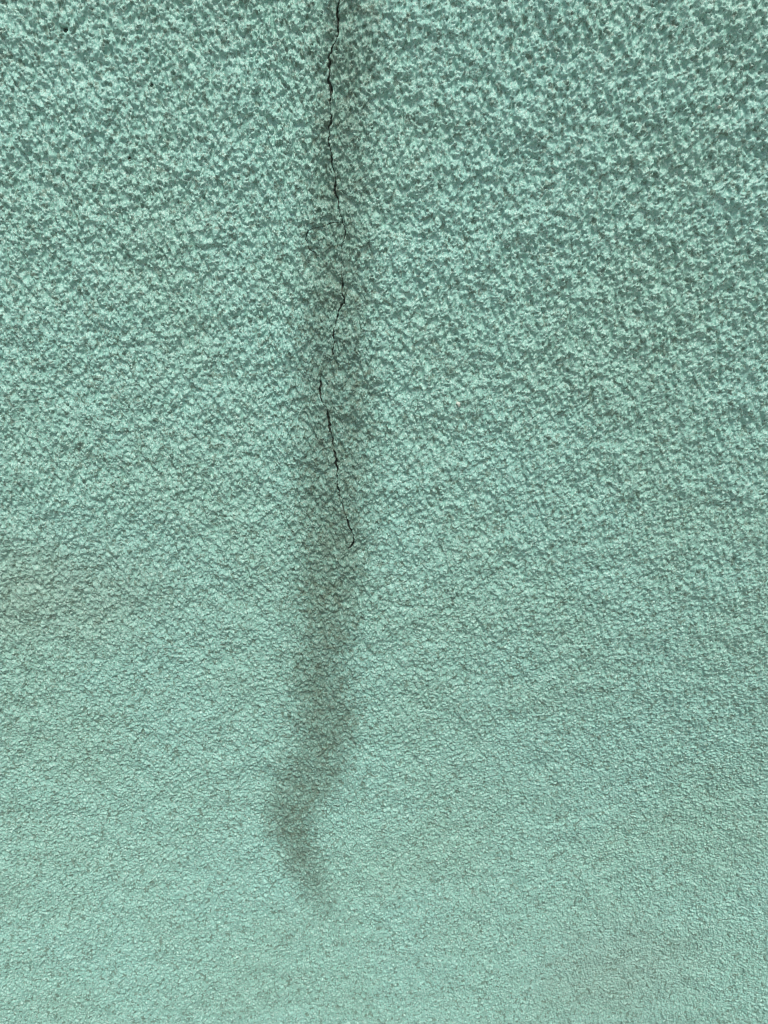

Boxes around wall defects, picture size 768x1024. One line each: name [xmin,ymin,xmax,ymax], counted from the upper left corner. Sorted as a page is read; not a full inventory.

crack [305,0,354,549]